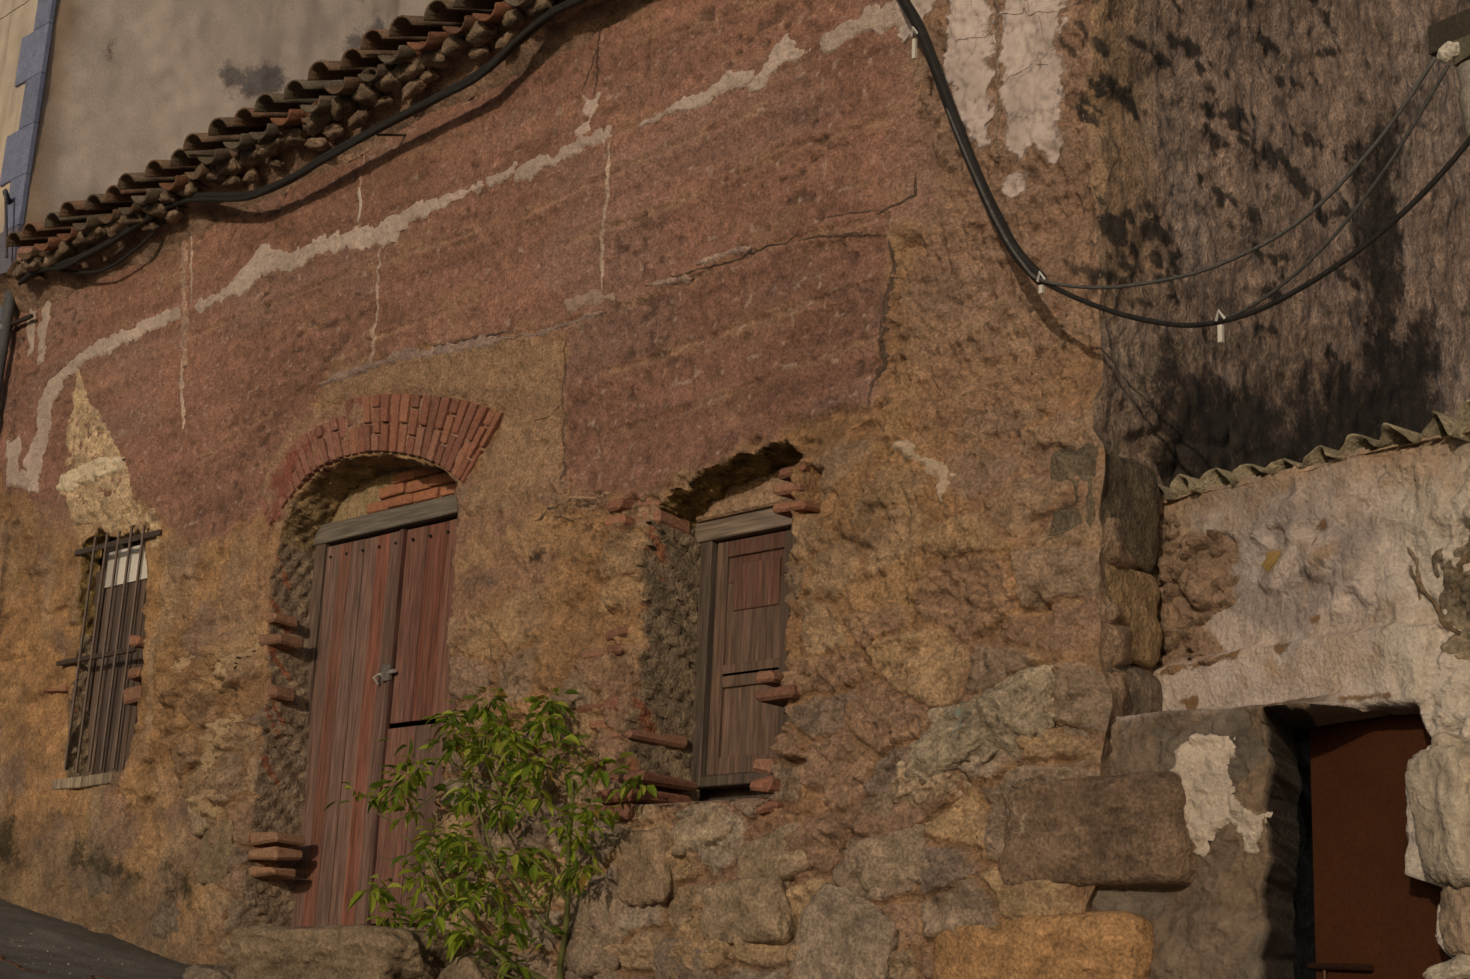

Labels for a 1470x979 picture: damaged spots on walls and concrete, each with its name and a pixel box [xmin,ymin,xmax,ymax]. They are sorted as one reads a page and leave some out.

peeling [639,0,1069,197]
damp [1058,37,1147,126]
damp [1260,0,1341,88]
peeling [5,92,615,550]
crack [318,139,612,523]
crack [645,172,918,406]
damp [1063,184,1182,307]
damp [1130,24,1443,488]
peeling [893,440,956,507]
spalling [1431,519,1470,661]